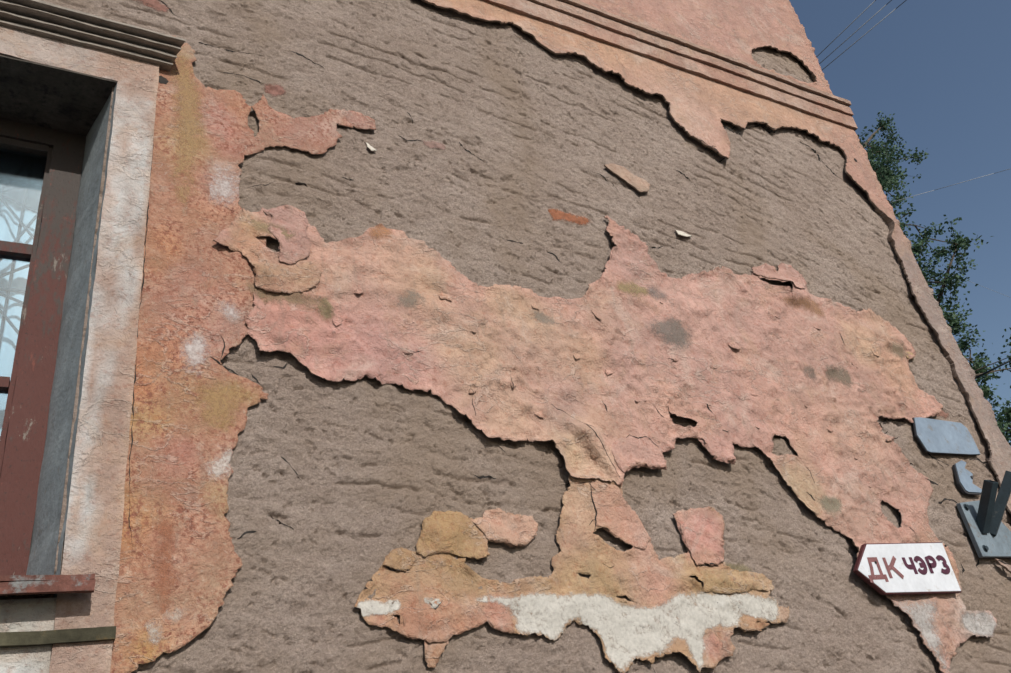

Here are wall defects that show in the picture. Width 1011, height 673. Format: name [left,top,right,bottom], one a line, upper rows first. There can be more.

spalling [54,87,114,575]
spalling [40,0,943,354]
spalling [131,205,1011,673]
crack [553,404,657,533]